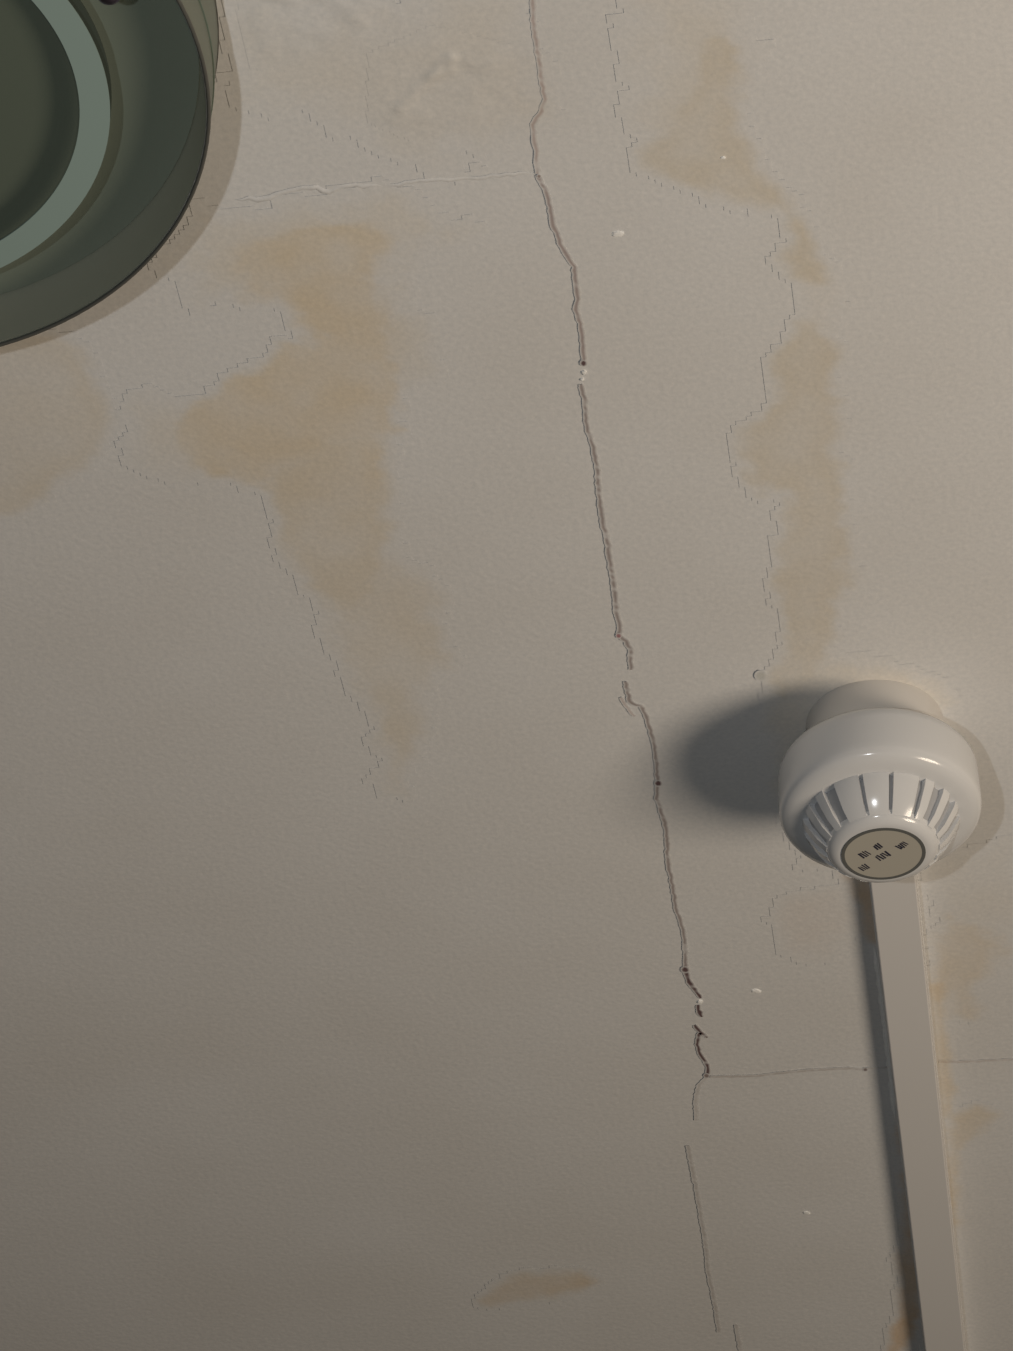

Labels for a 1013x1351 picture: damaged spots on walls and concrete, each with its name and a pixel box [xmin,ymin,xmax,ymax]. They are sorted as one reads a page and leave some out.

damp [0,0,568,803]
crack [529,0,887,1351]
damp [606,0,965,873]
damp [918,835,1013,1239]